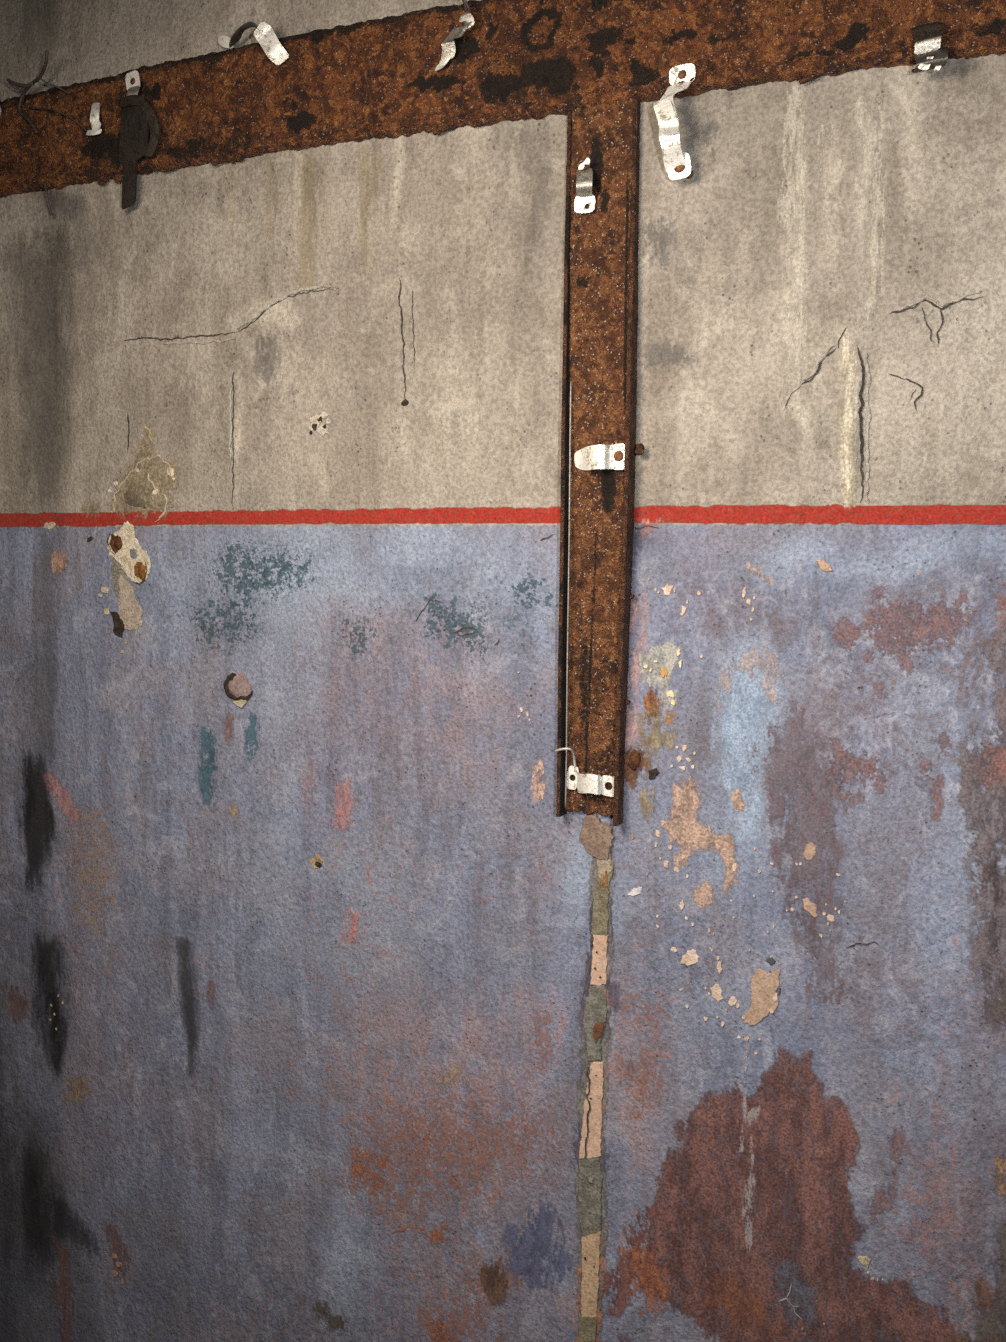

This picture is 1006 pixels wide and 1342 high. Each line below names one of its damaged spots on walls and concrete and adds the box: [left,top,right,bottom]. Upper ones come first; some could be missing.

corrosion [0,0,1006,199]
crack [124,285,338,506]
crack [783,327,923,503]
crack [891,291,984,344]
peeling [50,548,69,575]
peeling [80,423,180,653]
peeling [655,745,781,1054]
peeling [795,842,816,865]
peeling [786,896,846,938]